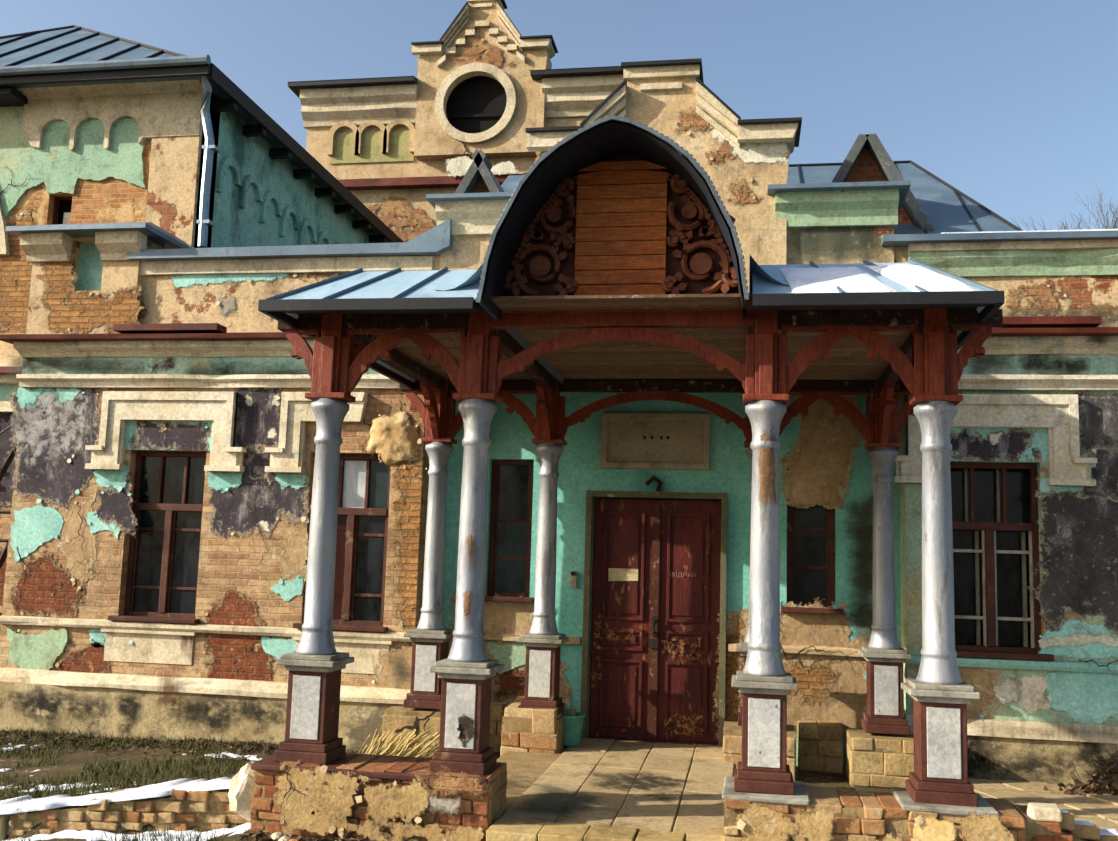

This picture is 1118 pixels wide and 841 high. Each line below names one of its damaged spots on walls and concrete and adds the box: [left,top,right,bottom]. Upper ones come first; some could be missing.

spalling [0,208,144,334]
peeling [0,387,138,674]
peeling [205,388,311,601]
flaking render [759,395,867,509]
peeling [950,390,1118,725]
mould [11,693,105,726]
mould [119,697,140,732]
damp [163,701,281,731]
spalling [202,589,296,681]
flaking render [660,608,749,740]
flaking render [780,598,871,736]
damp [968,736,1101,777]